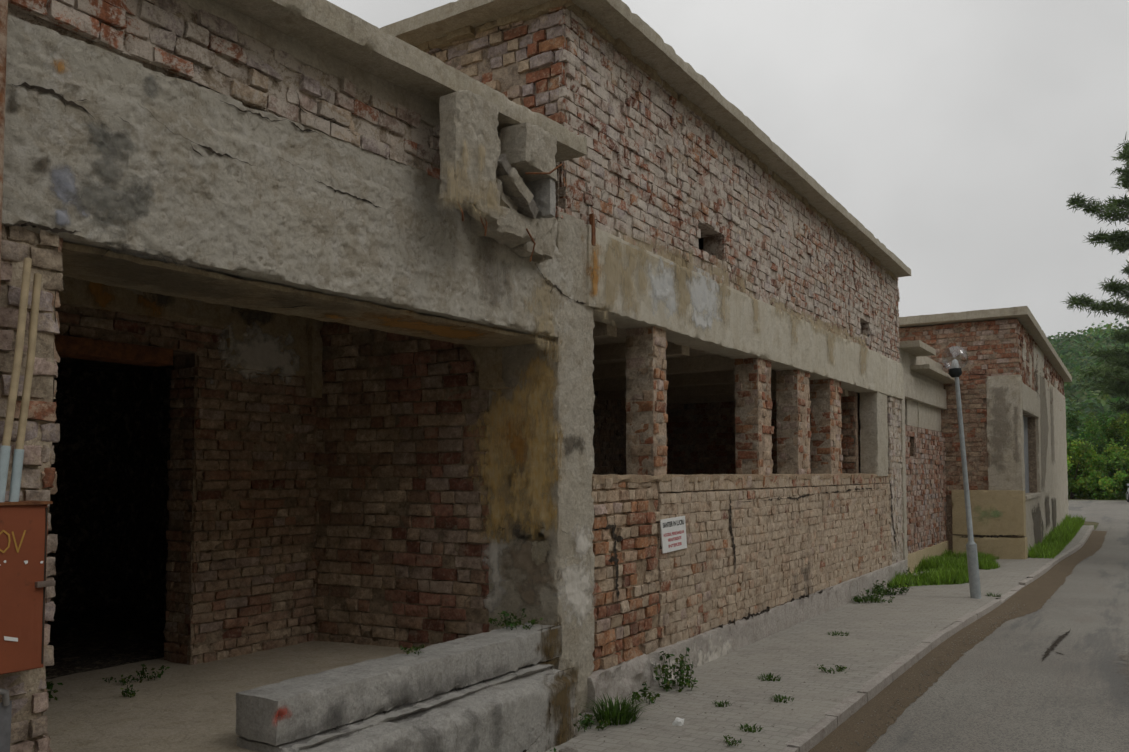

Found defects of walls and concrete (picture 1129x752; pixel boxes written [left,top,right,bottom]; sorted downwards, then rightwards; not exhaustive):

crack [8,82,399,212]
spalling [496,154,562,262]
crack [595,519,623,607]